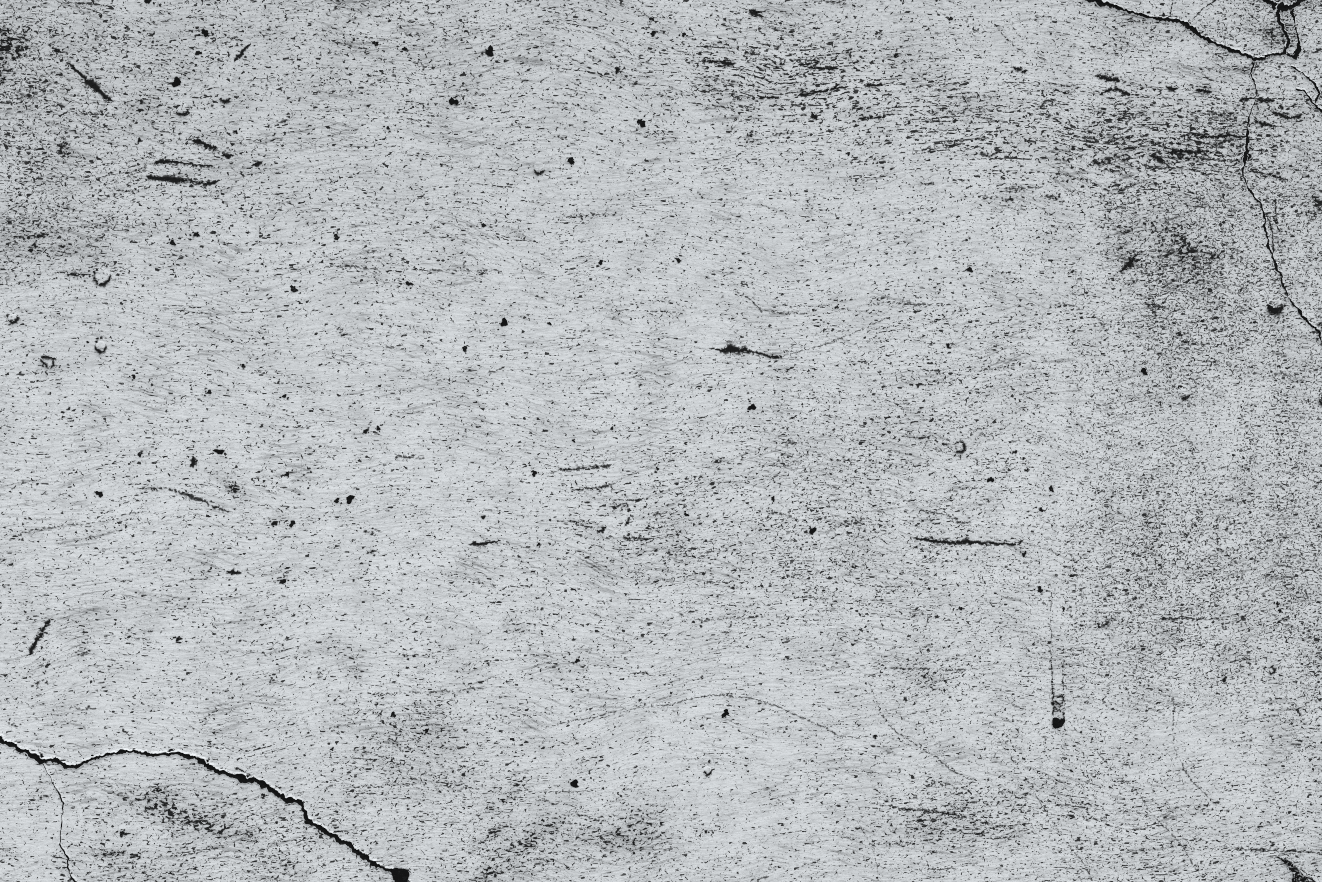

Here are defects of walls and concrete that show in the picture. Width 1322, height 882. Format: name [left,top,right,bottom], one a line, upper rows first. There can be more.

crack [1082,0,1322,346]
crack [0,733,413,882]